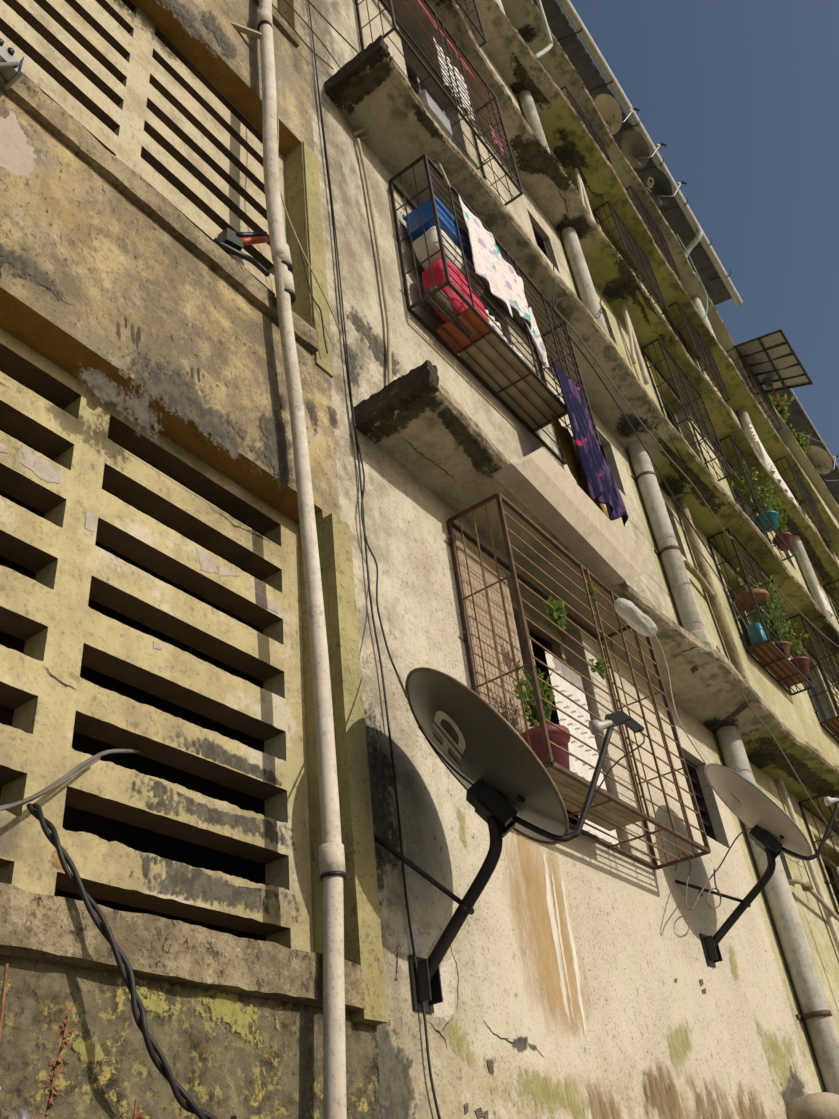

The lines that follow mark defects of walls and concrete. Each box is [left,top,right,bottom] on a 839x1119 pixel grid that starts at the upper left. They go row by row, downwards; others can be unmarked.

leakage [553,146,573,168]
crack [402,437,458,483]
leakage [543,853,588,1042]
crack [429,948,459,1048]
crack [484,1021,544,1057]
leakage [512,1036,537,1052]
flaking render [464,1103,489,1119]
leakage [589,1082,621,1119]
leakage [644,1064,767,1119]